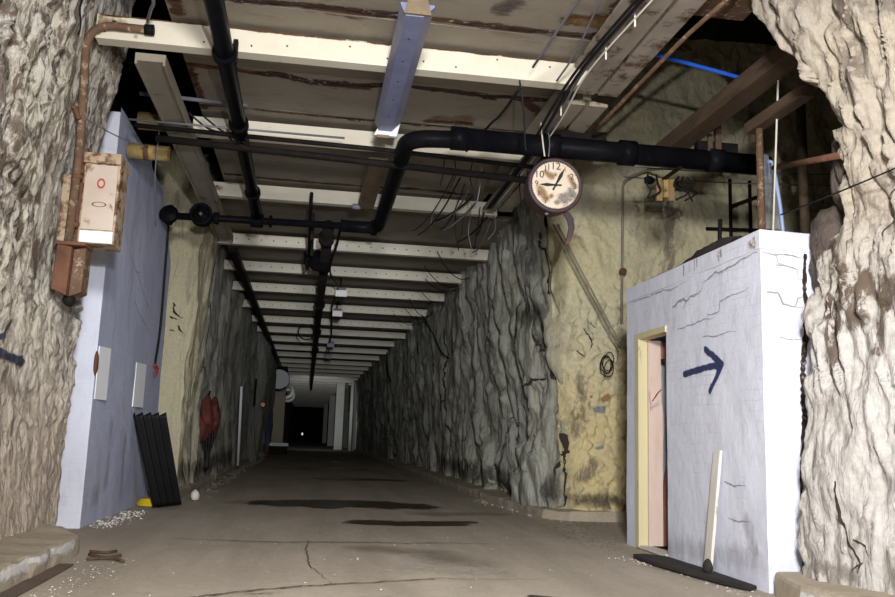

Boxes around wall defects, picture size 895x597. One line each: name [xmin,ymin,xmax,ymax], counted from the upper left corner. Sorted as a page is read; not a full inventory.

corrosion [231,0,398,19]
corrosion [431,0,620,40]
crack [630,251,809,498]
crack [193,540,460,597]